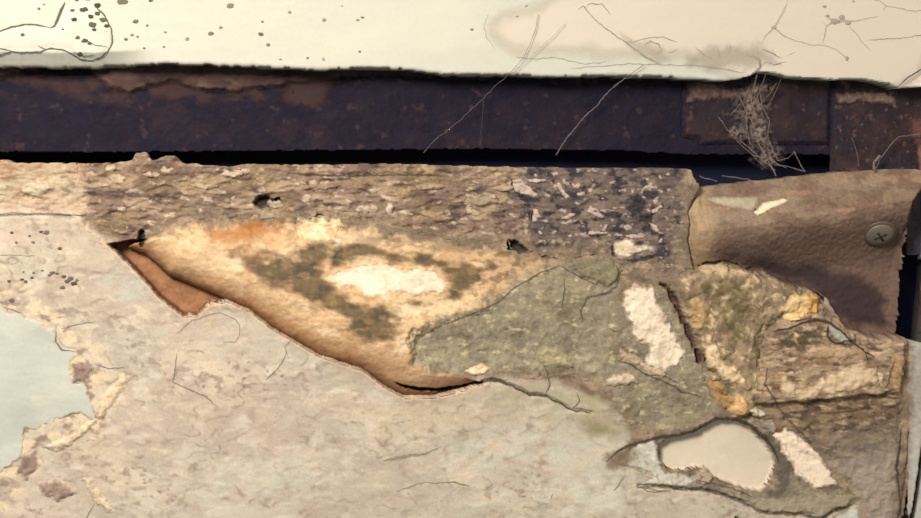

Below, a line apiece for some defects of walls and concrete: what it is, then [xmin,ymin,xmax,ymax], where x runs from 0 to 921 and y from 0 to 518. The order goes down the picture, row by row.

crack [518,0,921,76]
leakage [244,243,483,339]
peeling [0,152,921,518]
crack [482,366,591,413]